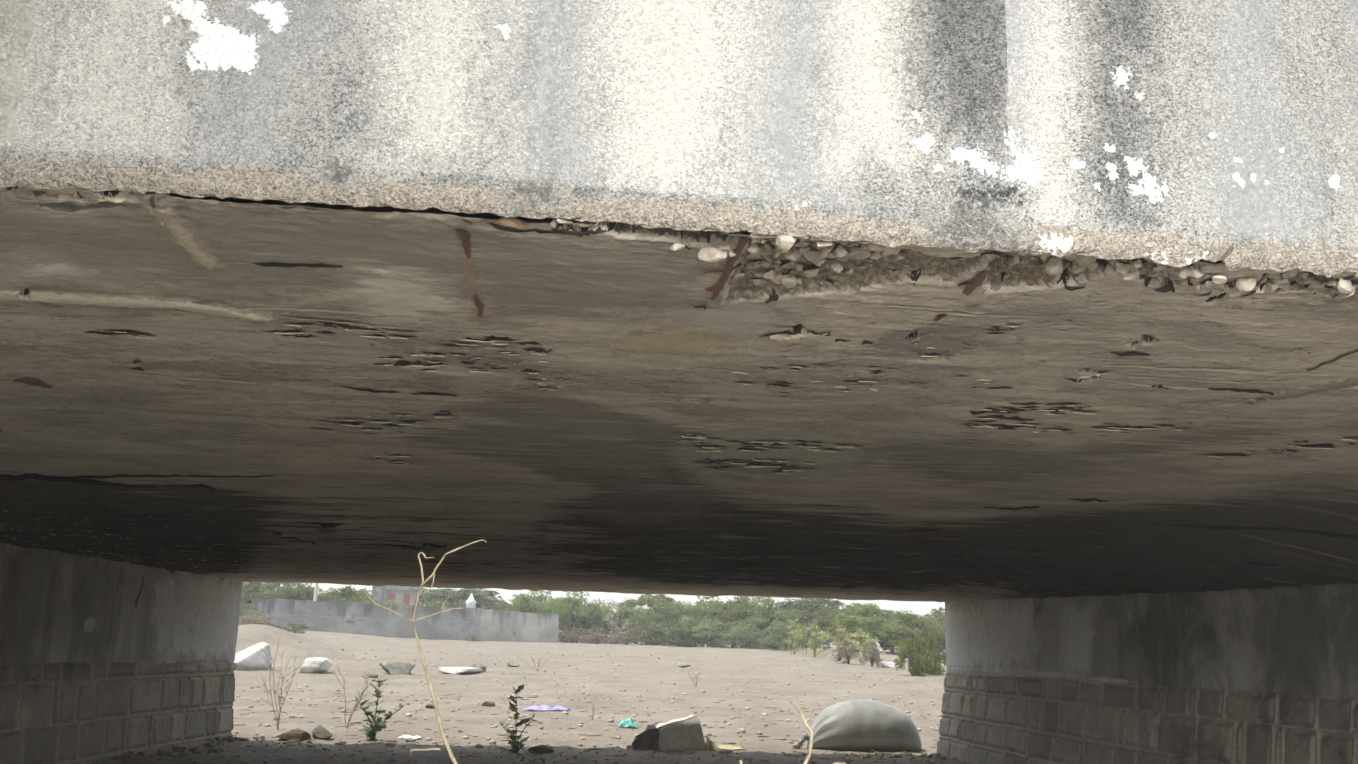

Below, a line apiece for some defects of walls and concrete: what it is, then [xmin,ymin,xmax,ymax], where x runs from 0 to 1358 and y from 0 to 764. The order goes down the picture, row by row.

peeling [160,0,293,75]
crack [149,196,418,215]
peeling [912,109,1044,191]
peeling [1069,158,1086,169]
peeling [1092,144,1170,207]
spalling [552,221,1358,310]
water stain [394,394,733,527]
water stain [860,429,1278,487]